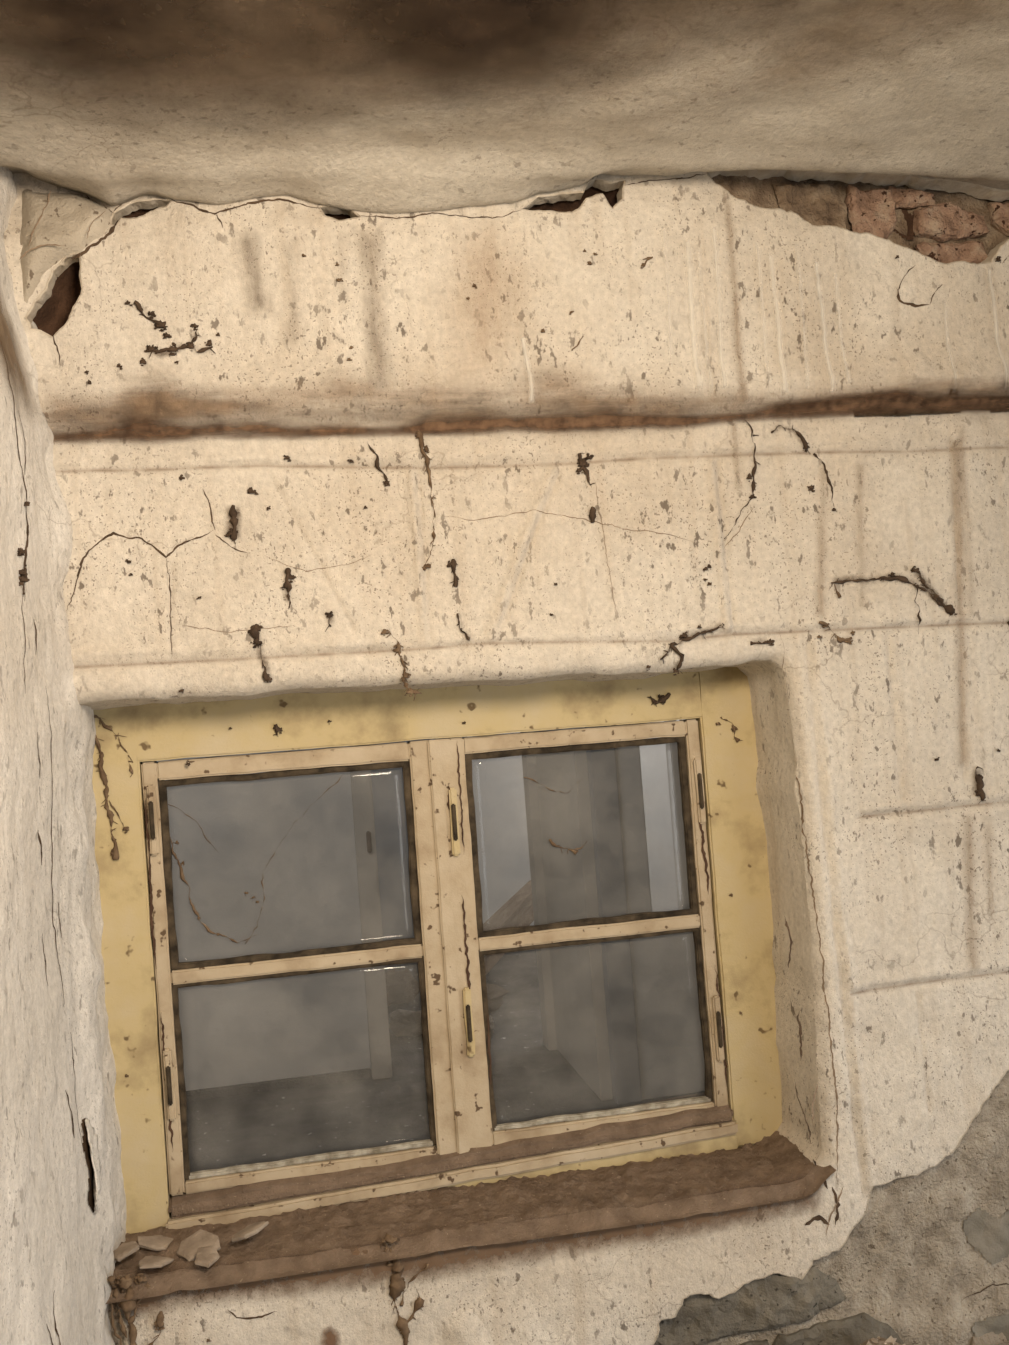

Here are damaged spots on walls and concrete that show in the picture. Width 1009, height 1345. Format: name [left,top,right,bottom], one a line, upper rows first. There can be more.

crack [25,174,705,363]
flaking render [707,169,1009,264]
crack [66,490,372,651]
crack [7,366,64,998]
peeling [447,746,464,845]
peeling [144,800,157,969]
peeling [699,823,709,893]
peeling [462,897,471,989]
crack [65,1032,83,1147]
flaking render [654,1070,1009,1345]
crack [47,1290,61,1345]
crack [227,1309,277,1320]